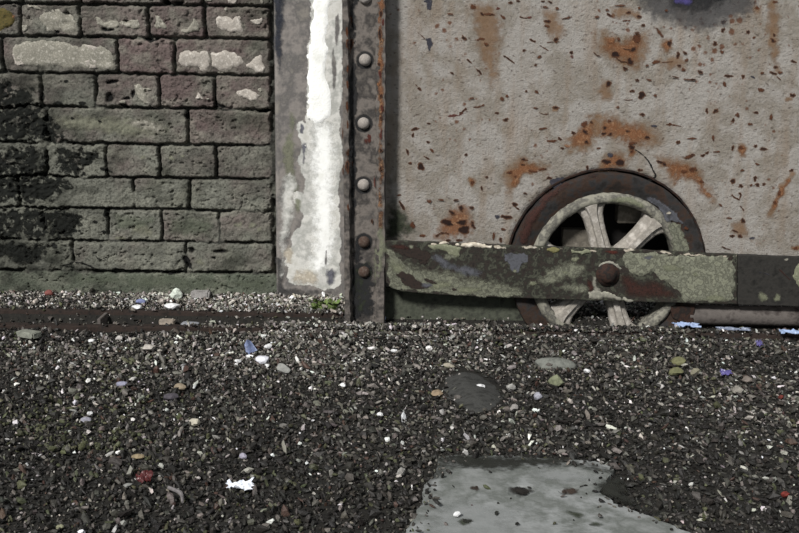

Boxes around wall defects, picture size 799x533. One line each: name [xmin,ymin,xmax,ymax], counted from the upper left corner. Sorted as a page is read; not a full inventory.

damp [274,0,284,65]
corrosion [593,4,703,81]
corrosion [547,113,682,168]
damp [0,78,98,264]
corrosion [505,158,546,189]
corrosion [656,151,722,207]
corrosion [436,199,476,242]
corrosion [492,202,519,242]
damp [276,257,318,296]
peeling [387,241,537,298]
peeling [588,277,633,302]
peeling [599,248,736,303]